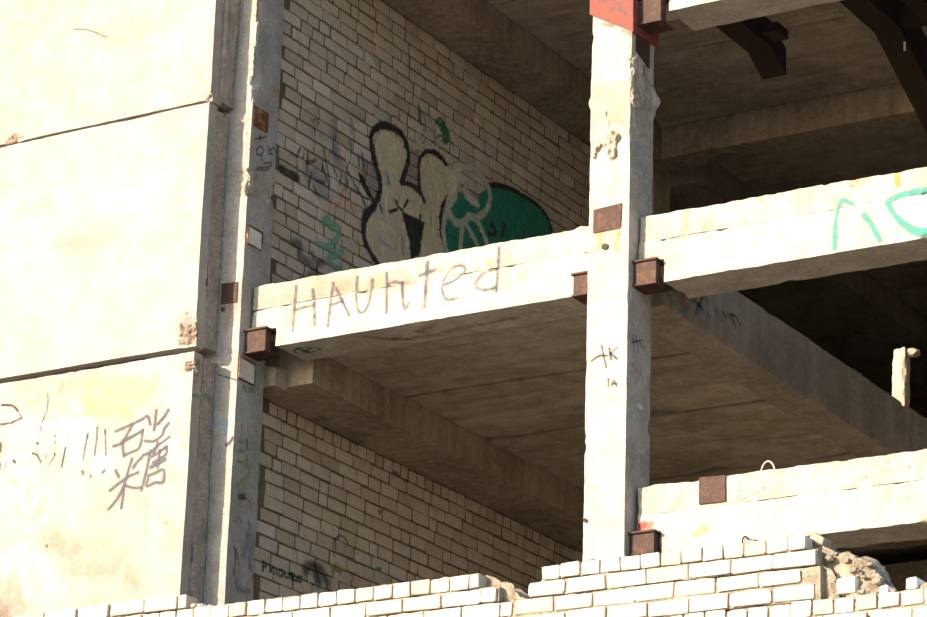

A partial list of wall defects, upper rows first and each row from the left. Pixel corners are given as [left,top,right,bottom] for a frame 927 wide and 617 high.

spalling [231,169,272,206]